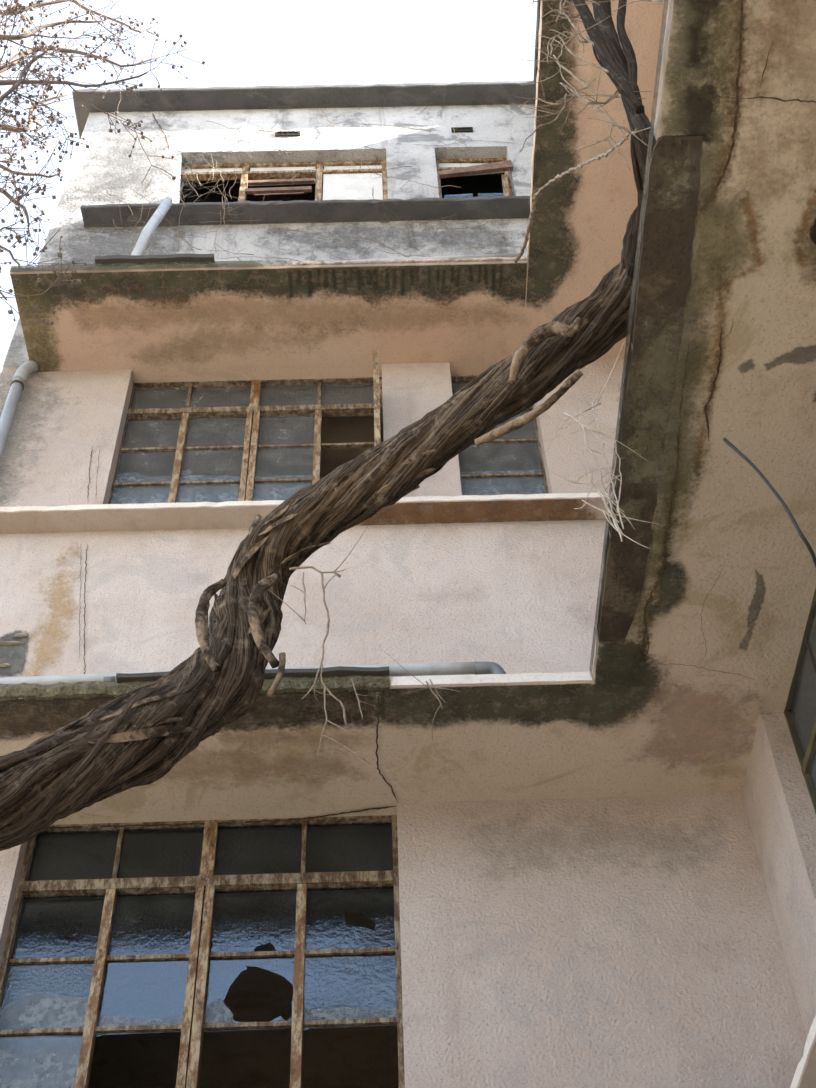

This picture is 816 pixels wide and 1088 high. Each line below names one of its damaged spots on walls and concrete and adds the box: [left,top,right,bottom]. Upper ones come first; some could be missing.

damp [686,0,722,67]
damp [681,88,711,142]
crack [695,0,816,216]
damp [0,0,580,500]
damp [0,696,116,739]
damp [220,690,380,731]
crack [46,692,398,829]